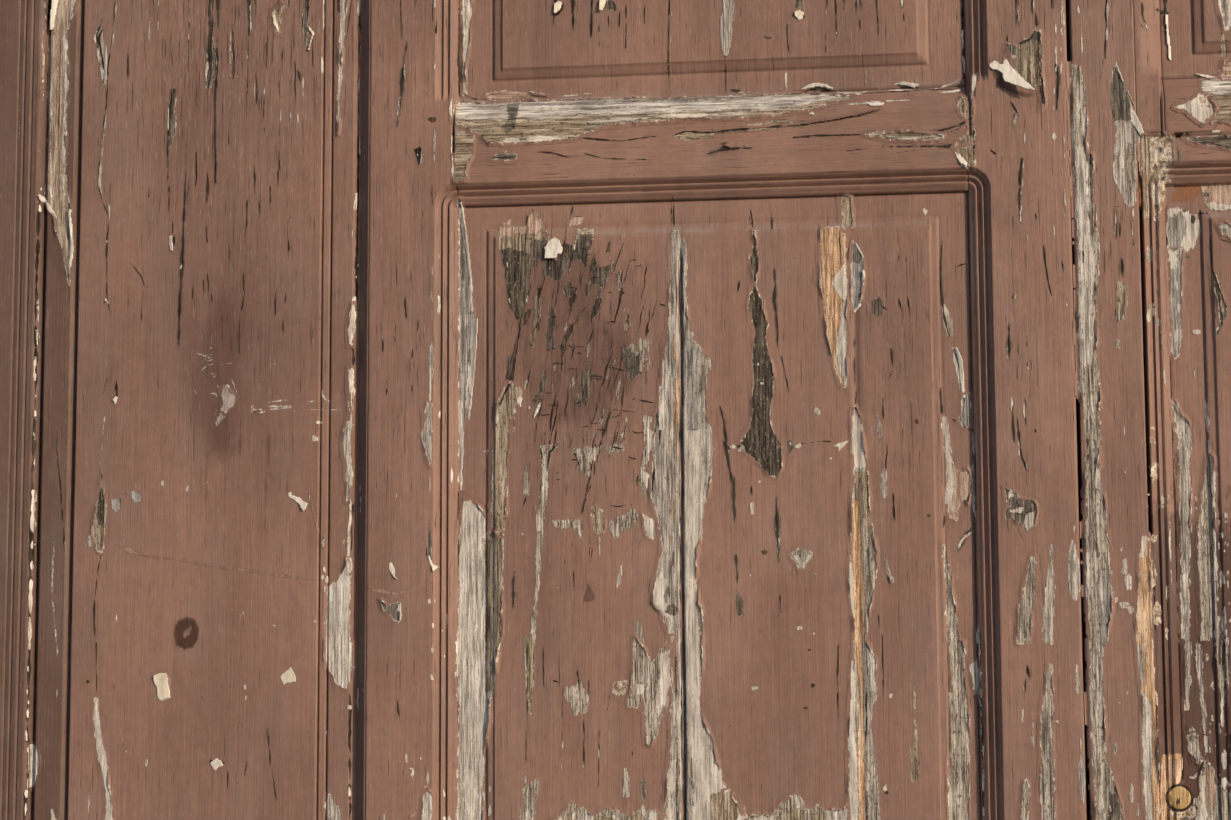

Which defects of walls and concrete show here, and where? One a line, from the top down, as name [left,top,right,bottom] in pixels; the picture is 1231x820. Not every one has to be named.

peeling [37,0,82,290]
peeling [314,0,408,820]
peeling [383,0,1050,820]
peeling [1002,0,1231,820]